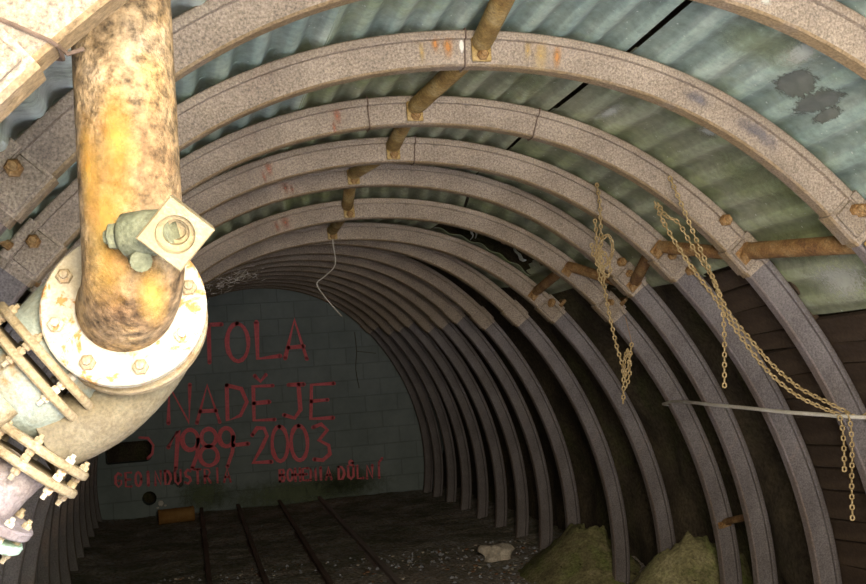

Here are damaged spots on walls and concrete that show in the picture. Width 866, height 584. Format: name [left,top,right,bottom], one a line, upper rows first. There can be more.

water stain [774,44,847,124]